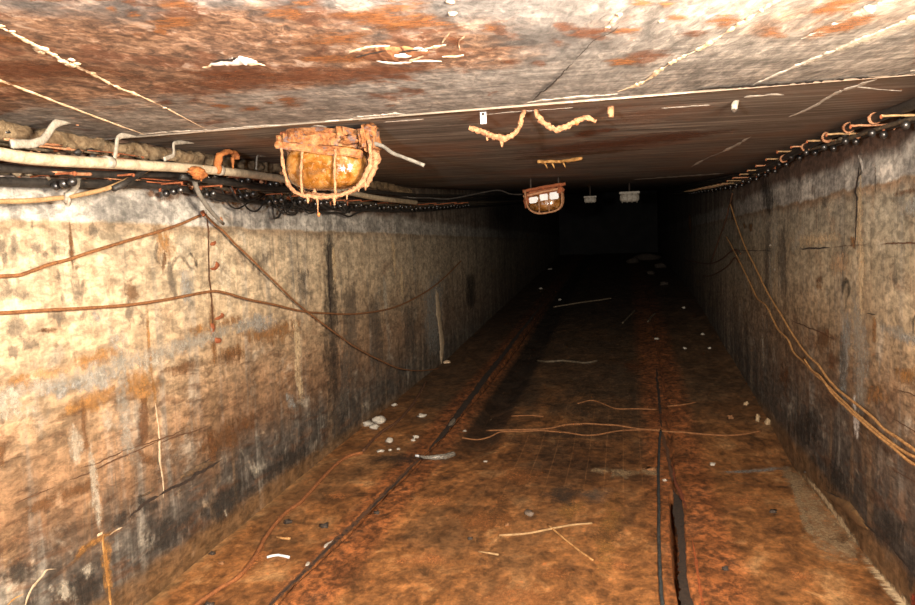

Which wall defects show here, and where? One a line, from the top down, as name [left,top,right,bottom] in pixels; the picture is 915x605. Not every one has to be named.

corrosion [0,61,111,87]
spalling [202,56,269,77]
corrosion [169,0,453,111]
spalling [348,33,464,65]
corrosion [554,22,640,45]
corrosion [807,0,878,37]
crack [802,155,915,319]
damp [324,236,343,401]
damp [286,322,303,407]
damp [57,320,164,497]
damp [4,563,53,605]
damp [867,561,915,605]